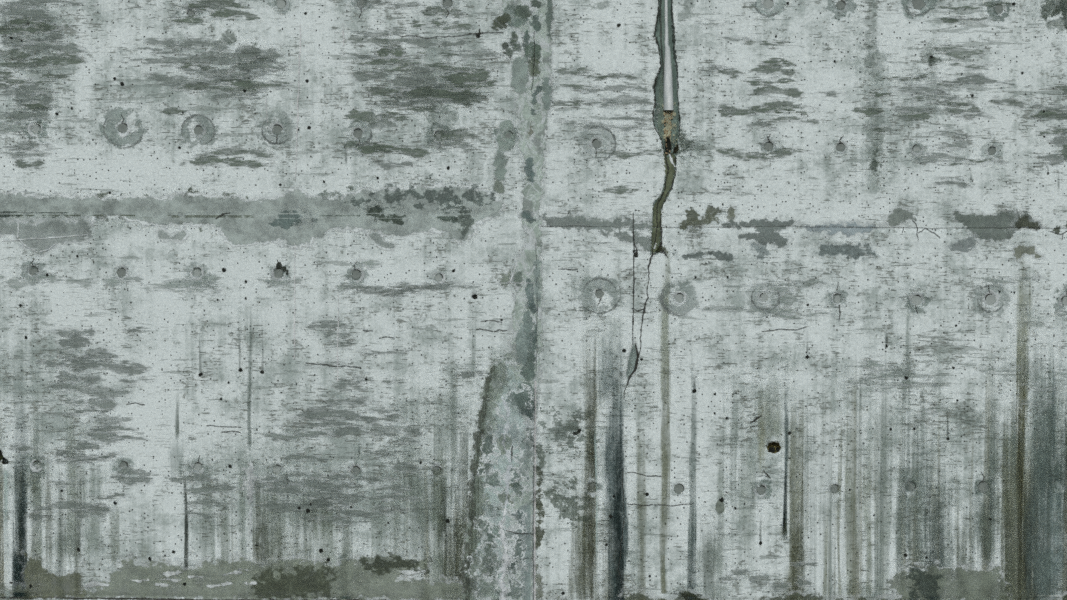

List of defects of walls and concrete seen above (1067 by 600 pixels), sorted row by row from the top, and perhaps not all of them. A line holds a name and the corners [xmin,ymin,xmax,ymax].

damp [242,461,256,533]
damp [6,553,469,600]
damp [534,564,543,600]
damp [623,589,707,600]
damp [760,592,843,600]
damp [881,559,1013,600]